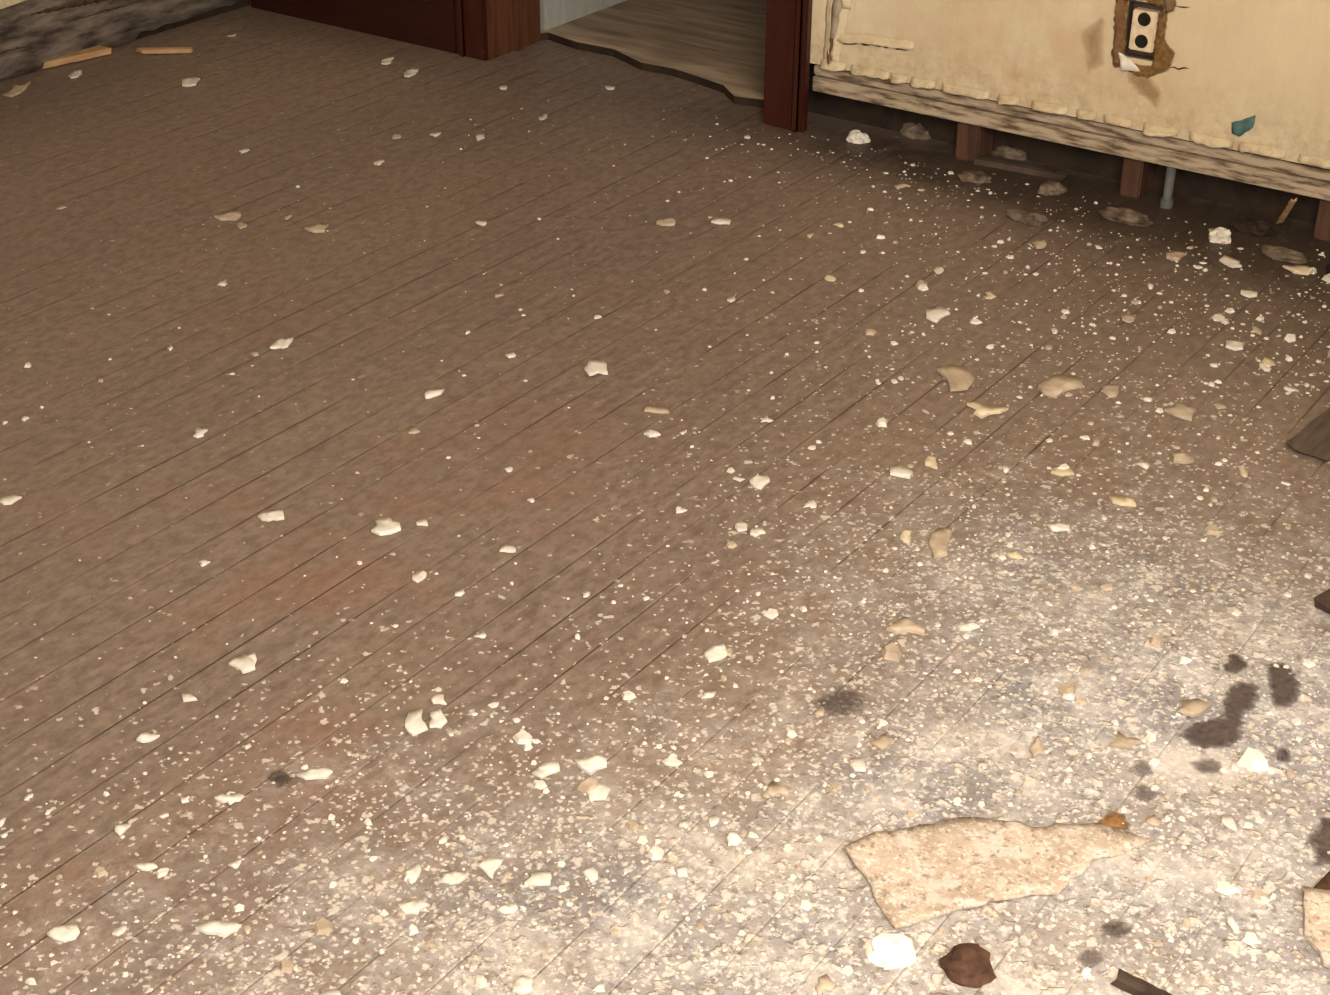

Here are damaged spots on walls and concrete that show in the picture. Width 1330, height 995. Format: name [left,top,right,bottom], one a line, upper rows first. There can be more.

peeling [820,0,1330,169]